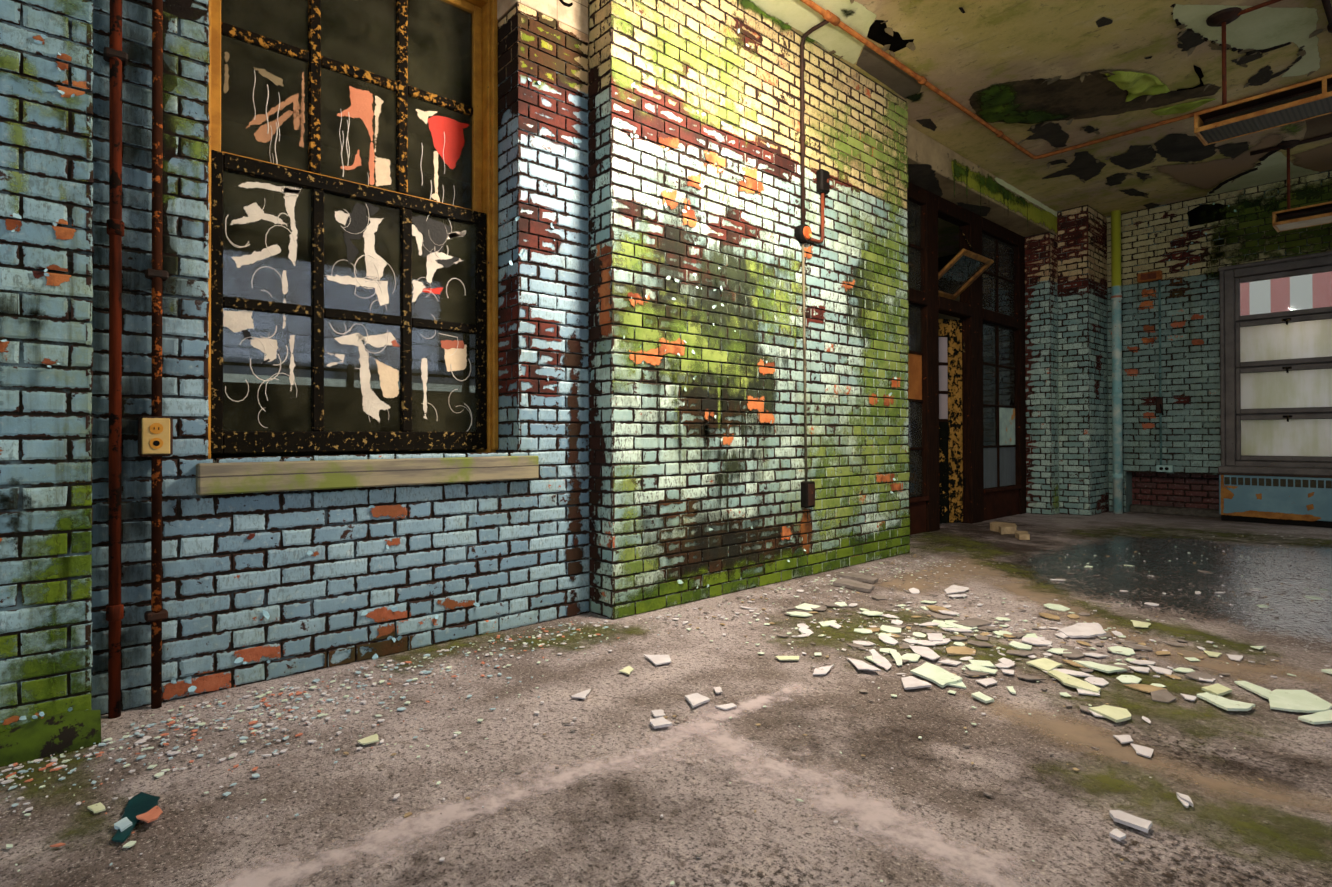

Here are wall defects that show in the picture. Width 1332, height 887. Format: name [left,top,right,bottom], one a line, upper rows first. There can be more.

flaking render [1173,4,1324,89]
flaking render [969,69,1320,353]
peeling [0,10,860,819]
water stain [616,188,798,581]
water stain [845,238,891,357]
peeling [995,177,1107,509]
water stain [0,479,33,550]
water stain [28,560,61,702]
water stain [56,517,73,555]
peeling [639,490,1332,724]
rust [1220,475,1321,521]
peeling [105,796,163,855]